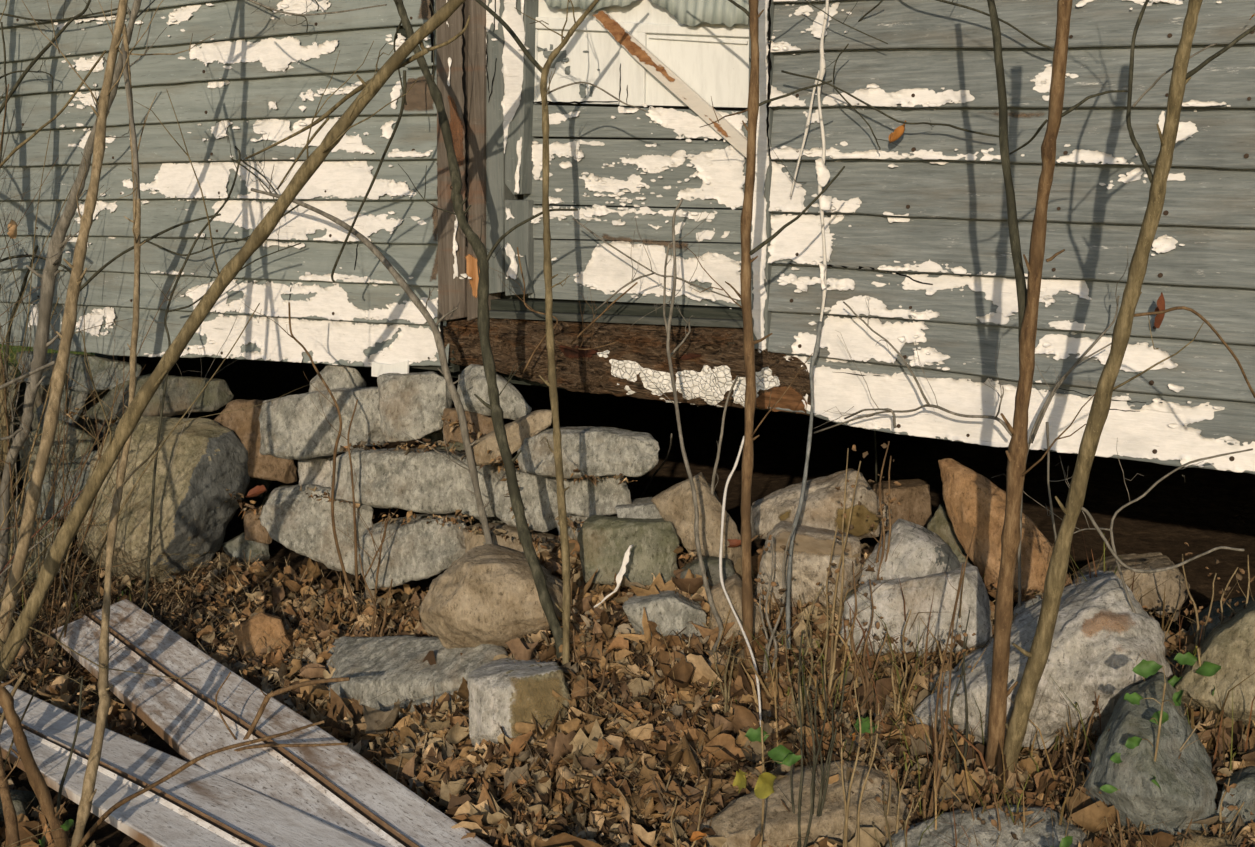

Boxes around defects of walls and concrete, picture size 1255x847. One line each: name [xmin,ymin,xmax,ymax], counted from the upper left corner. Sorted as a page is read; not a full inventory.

peeling [161,3,338,88]
peeling [268,0,331,19]
peeling [385,33,406,50]
peeling [65,81,433,253]
peeling [486,0,1255,472]
peeling [150,267,440,367]
crack [597,350,780,407]